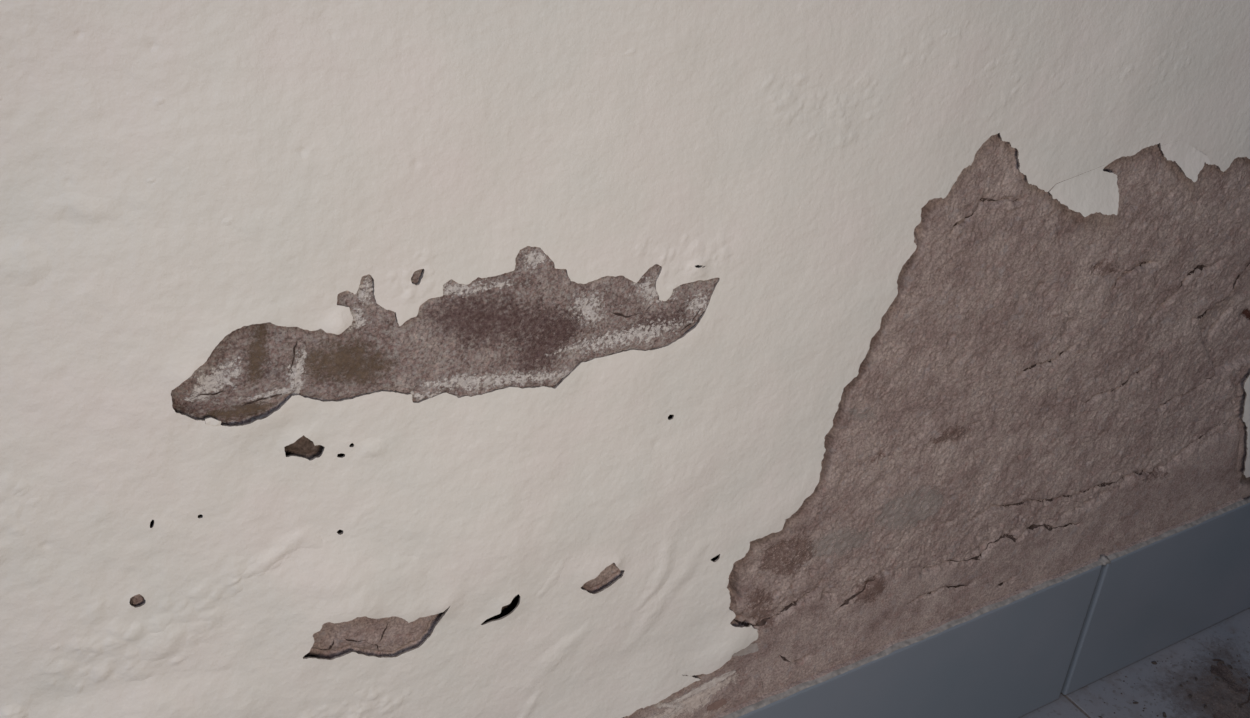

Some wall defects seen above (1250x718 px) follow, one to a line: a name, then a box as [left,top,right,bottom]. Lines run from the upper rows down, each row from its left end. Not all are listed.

peeling [171,246,718,425]
peeling [284,435,324,459]
spalling [623,133,1250,718]
peeling [581,563,623,593]